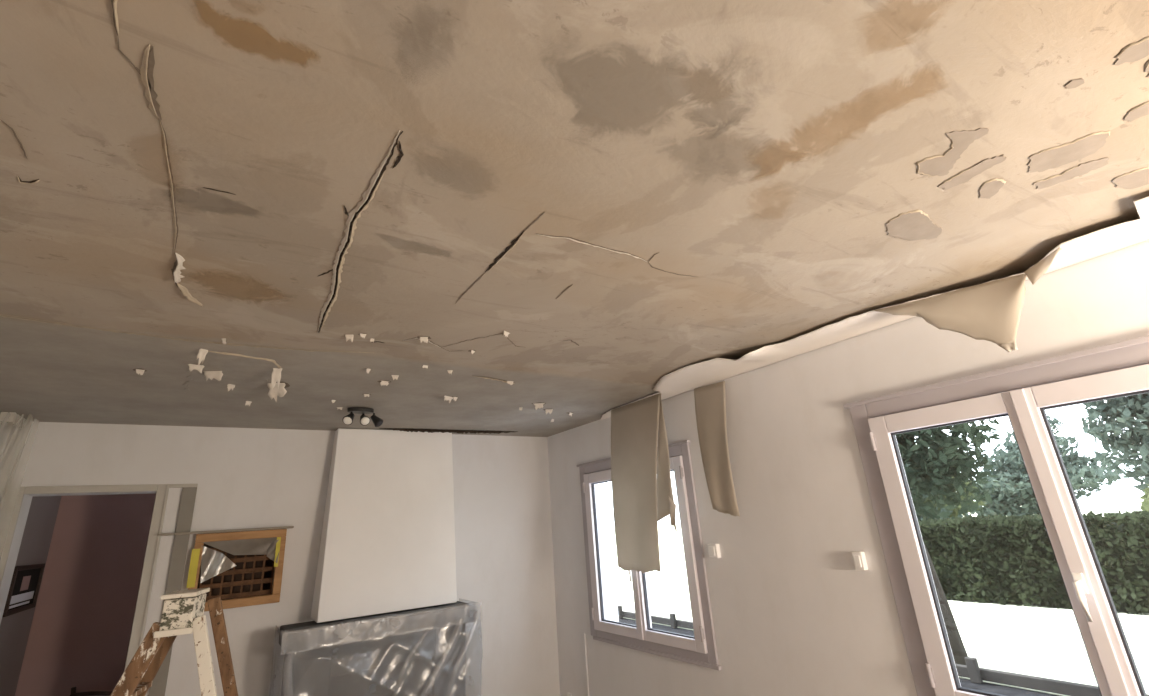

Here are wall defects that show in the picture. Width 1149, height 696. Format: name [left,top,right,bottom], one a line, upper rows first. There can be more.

damp [195,0,316,65]
peeling [1065,78,1084,89]
peeling [1114,37,1149,78]
peeling [1124,101,1149,122]
crack [111,0,203,307]
peeling [916,128,1006,199]
peeling [1027,131,1110,189]
peeling [1112,167,1149,189]
crack [317,130,404,333]
crack [456,212,696,303]
peeling [886,210,942,241]